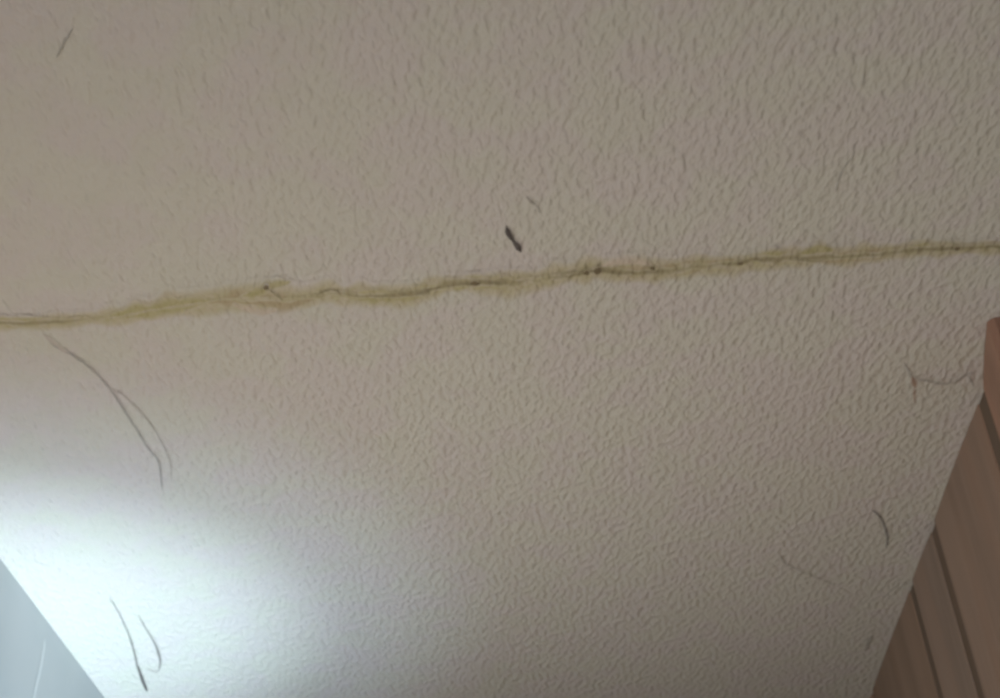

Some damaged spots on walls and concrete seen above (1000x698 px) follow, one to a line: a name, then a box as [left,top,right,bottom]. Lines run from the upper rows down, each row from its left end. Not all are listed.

leakage [0,235,1000,335]
crack [0,243,1000,497]